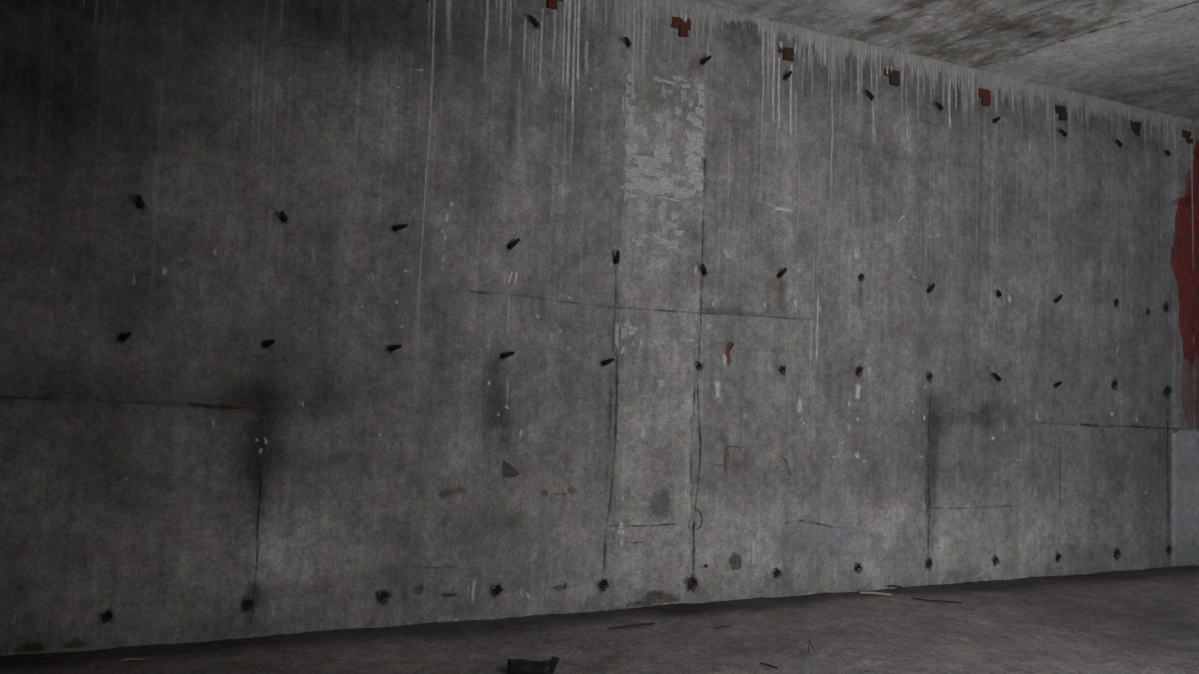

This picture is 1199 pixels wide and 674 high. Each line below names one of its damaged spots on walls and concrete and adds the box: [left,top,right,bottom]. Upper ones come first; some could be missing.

water stain [422,0,451,239]
water stain [484,0,1199,366]